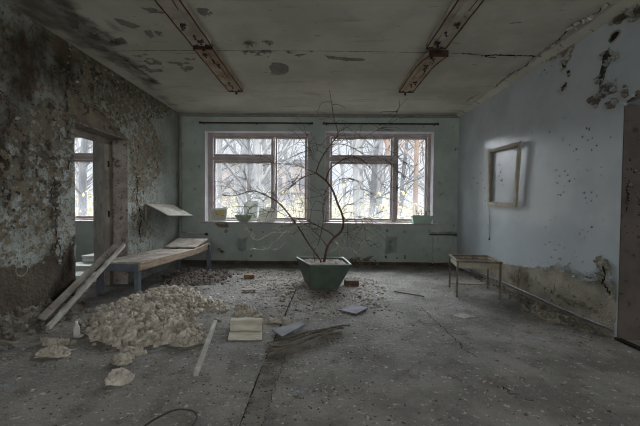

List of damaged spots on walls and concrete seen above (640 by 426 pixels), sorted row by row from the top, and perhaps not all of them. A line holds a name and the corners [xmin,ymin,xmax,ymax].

peeling [0,100,75,236]
water stain [0,31,80,192]
peeling [69,61,171,226]
peeling [242,40,289,75]
crack [454,3,609,88]
peeling [541,44,574,95]
peeling [586,2,640,109]
peeling [0,235,77,317]
water stain [51,253,73,301]
crack [237,290,298,426]
crack [421,307,476,357]
peeling [470,244,617,338]